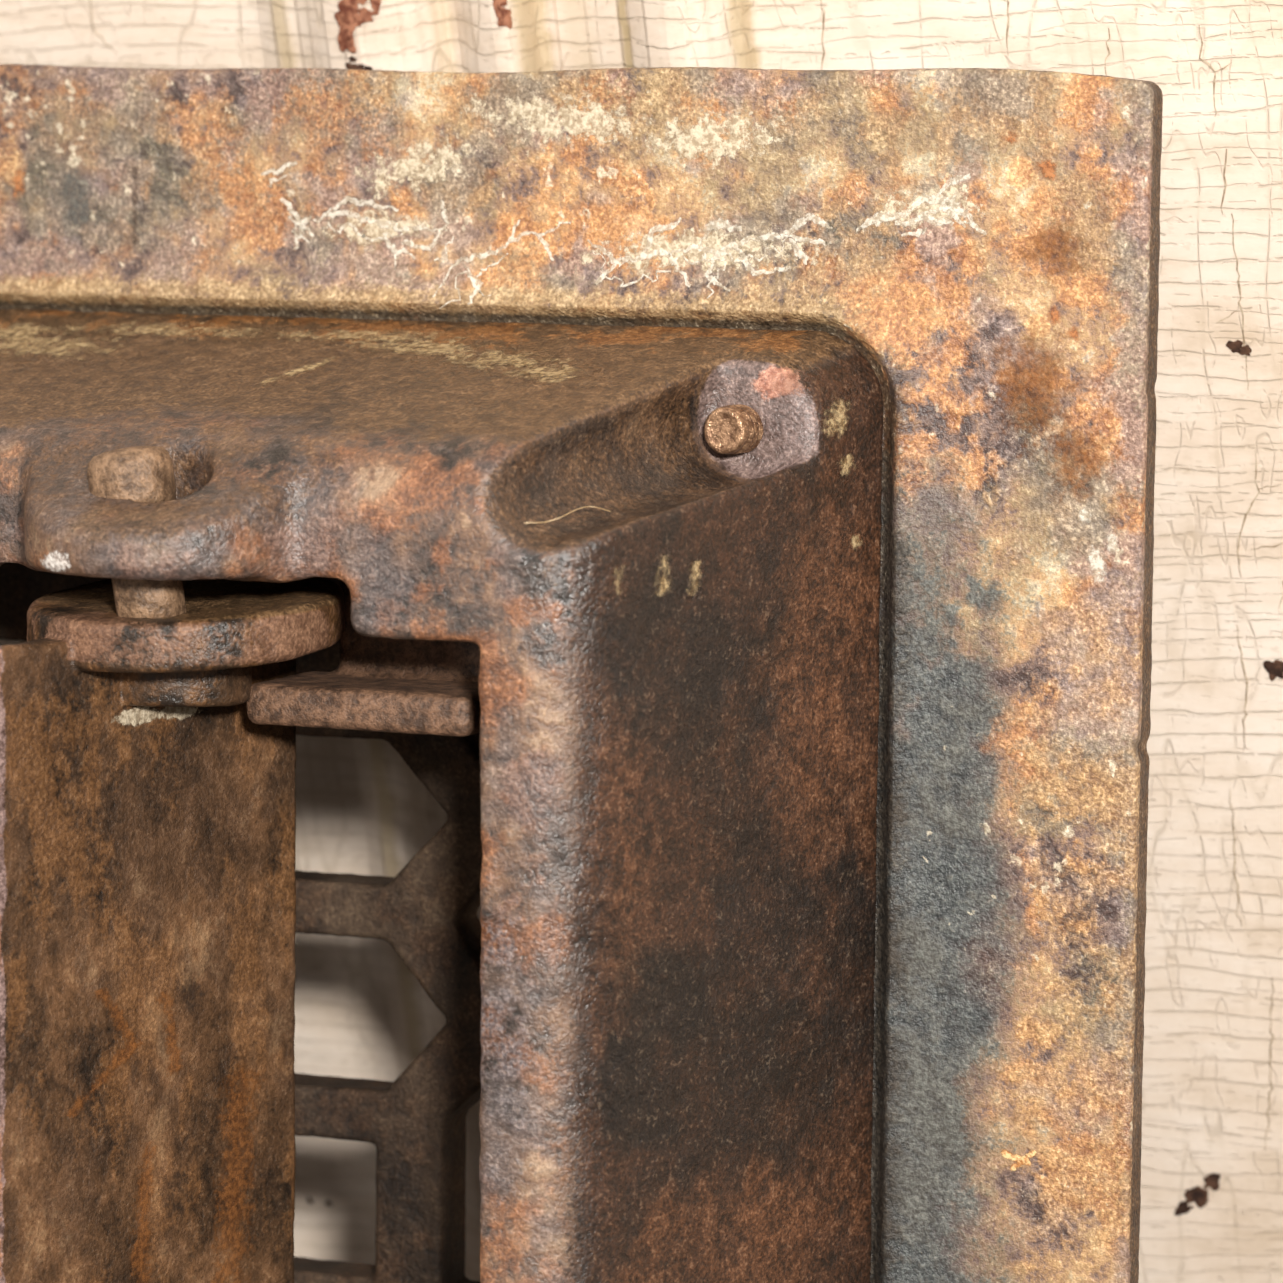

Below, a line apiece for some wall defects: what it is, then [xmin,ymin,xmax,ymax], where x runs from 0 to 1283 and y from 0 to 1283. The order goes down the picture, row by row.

crack [819,3,827,70]
crack [1002,0,1010,56]
crack [1104,28,1112,76]
crack [1199,25,1232,117]
rust [1038,160,1055,178]
crack [1217,149,1249,390]
crack [1237,450,1283,576]
crack [1236,625,1248,751]
crack [1229,795,1242,926]
crack [1265,982,1275,1149]
rust [1001,1150,1037,1171]